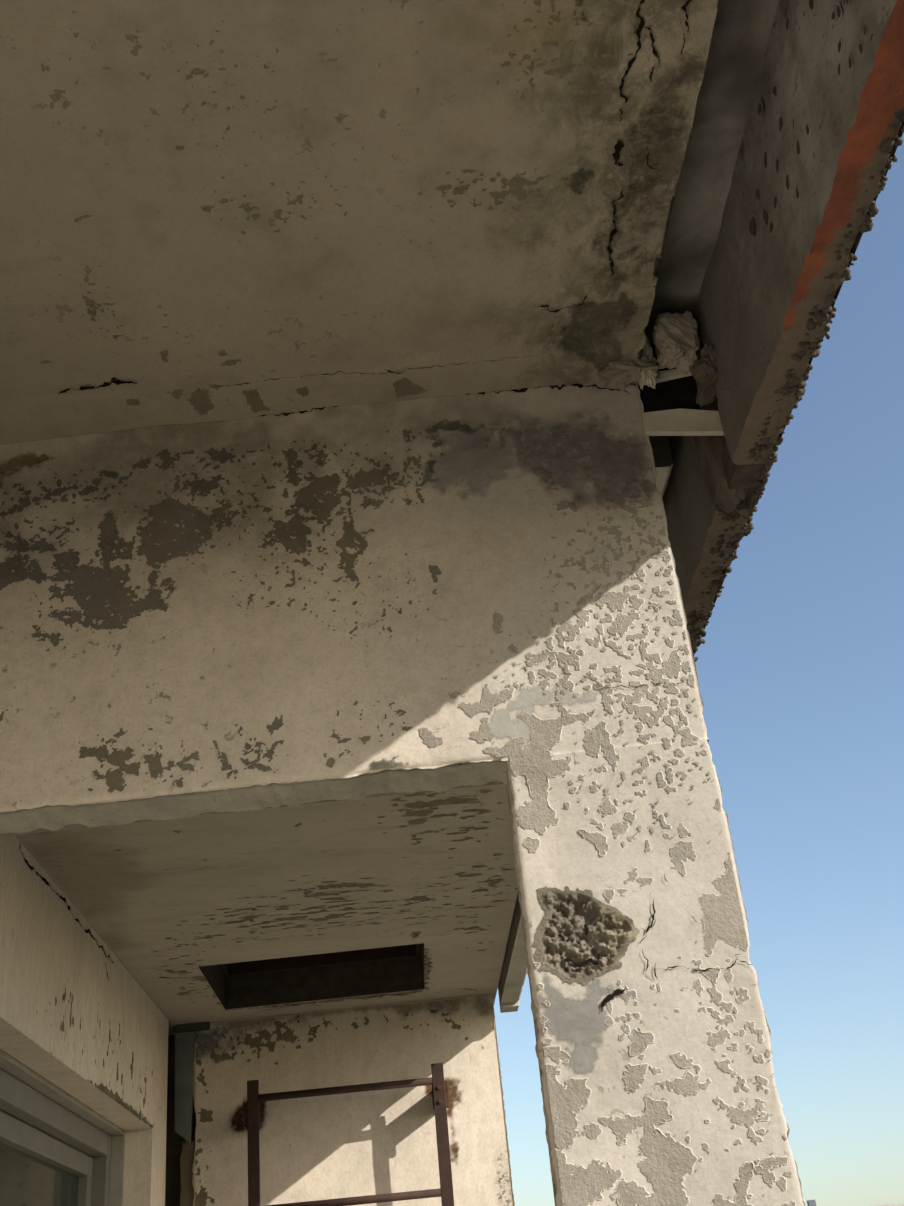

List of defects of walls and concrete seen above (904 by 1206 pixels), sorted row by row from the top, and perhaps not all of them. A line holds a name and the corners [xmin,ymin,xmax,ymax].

leakage [570,169,594,194]
crack [531,0,692,313]
leakage [560,293,638,371]
crack [59,378,137,394]
peeling [0,427,442,652]
peeling [71,715,288,793]
peeling [154,460,714,1003]
crack [640,876,752,980]
crack [601,989,625,1012]
peeling [528,852,796,1206]
rust [231,1101,266,1132]
rust [426,1078,461,1116]